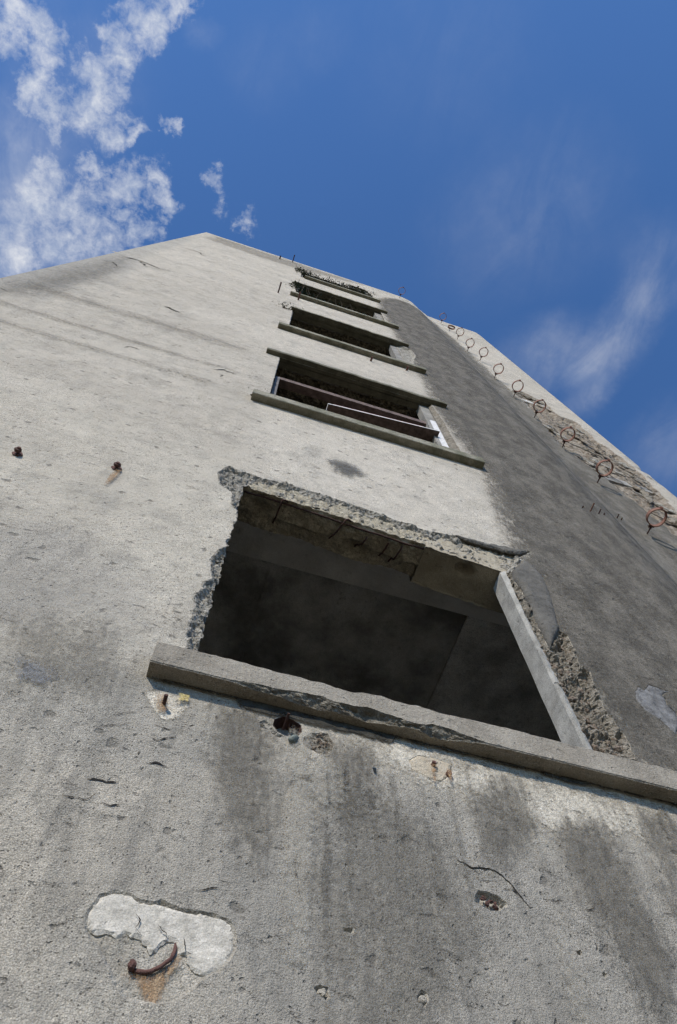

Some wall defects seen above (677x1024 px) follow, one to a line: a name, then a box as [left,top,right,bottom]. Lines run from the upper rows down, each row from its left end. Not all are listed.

spalling [507,388,677,536]
spalling [185,466,637,761]
peeling [635,685,677,734]
peeling [83,890,237,1005]
crack [457,856,533,907]
leakage [330,736,677,999]